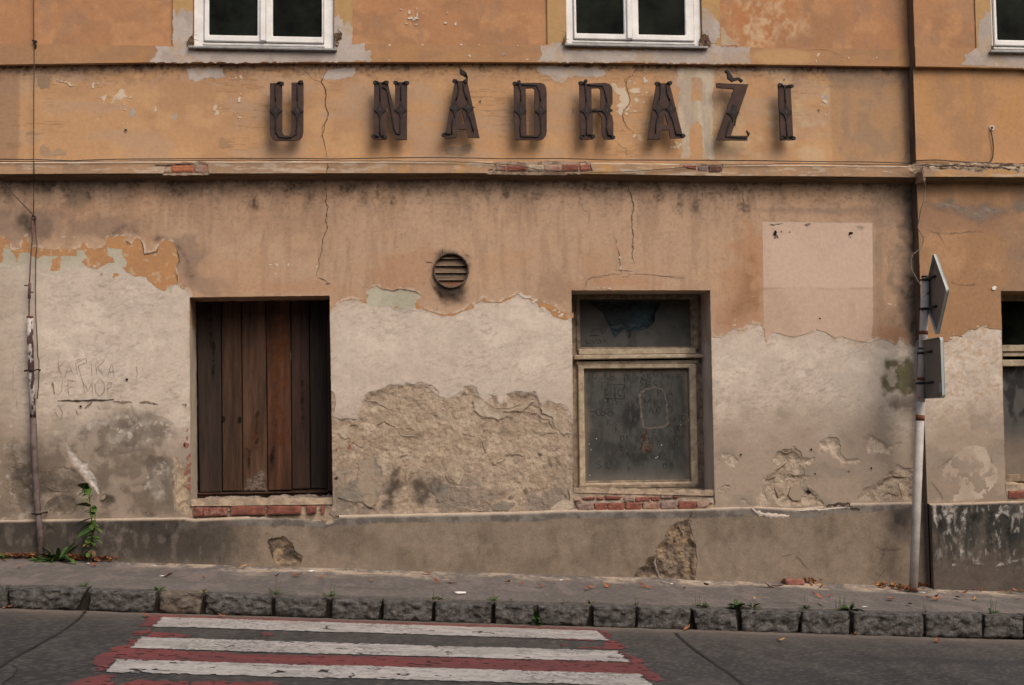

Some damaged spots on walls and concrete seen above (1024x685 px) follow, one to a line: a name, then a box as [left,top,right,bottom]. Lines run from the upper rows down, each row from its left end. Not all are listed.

crack [305,66,330,284]
crack [584,187,683,287]
peeling [0,236,1024,580]
leakage [882,359,915,408]
leakage [933,508,983,525]